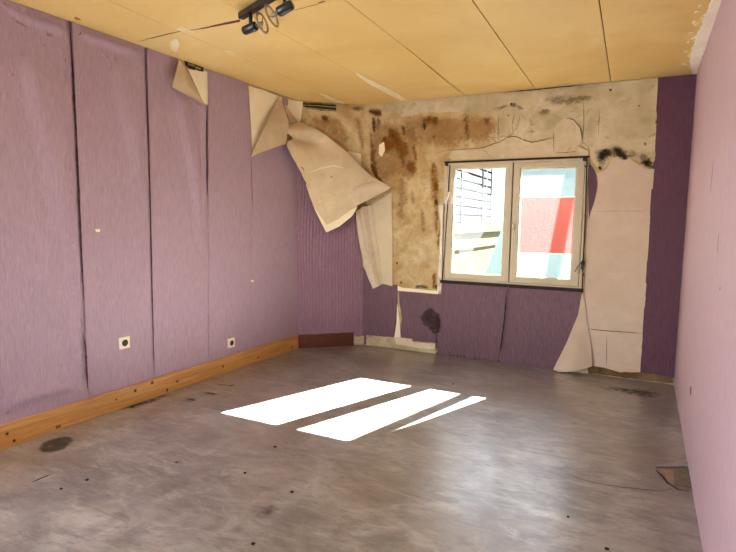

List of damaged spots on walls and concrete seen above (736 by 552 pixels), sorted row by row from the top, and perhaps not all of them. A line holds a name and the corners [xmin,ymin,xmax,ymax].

flaking render [184,61,204,72]
flaking render [303,102,336,111]
leakage [353,107,417,181]
crack [437,85,600,154]
flaking render [384,79,658,168]
leakage [598,147,653,169]
peeling [437,205,445,291]
leakage [420,308,441,350]